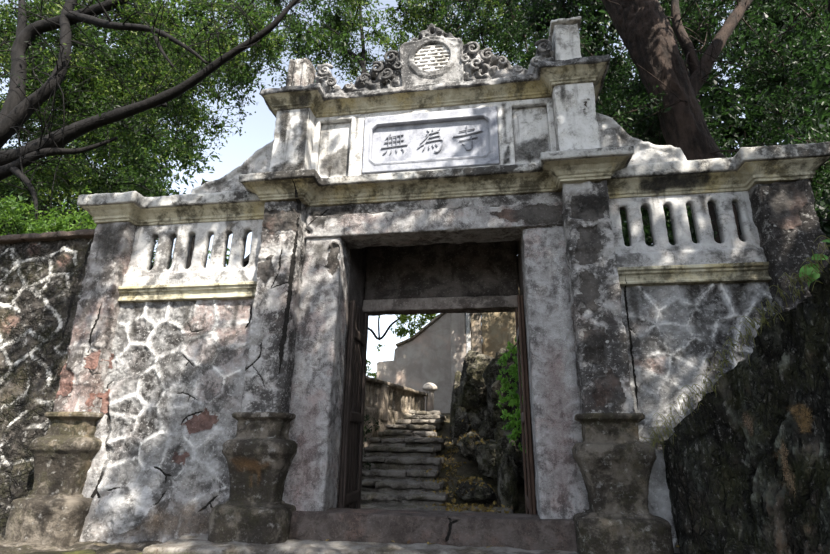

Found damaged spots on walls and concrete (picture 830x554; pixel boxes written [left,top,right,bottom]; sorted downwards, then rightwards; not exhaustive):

crack [245,174,331,387]
spalling [83,349,114,369]
crack [624,276,638,407]
spalling [55,363,74,398]
spalling [82,389,110,414]
crack [85,303,123,498]
spalling [181,407,220,434]
spalling [171,450,190,465]
crack [153,466,172,506]
crack [445,516,458,542]